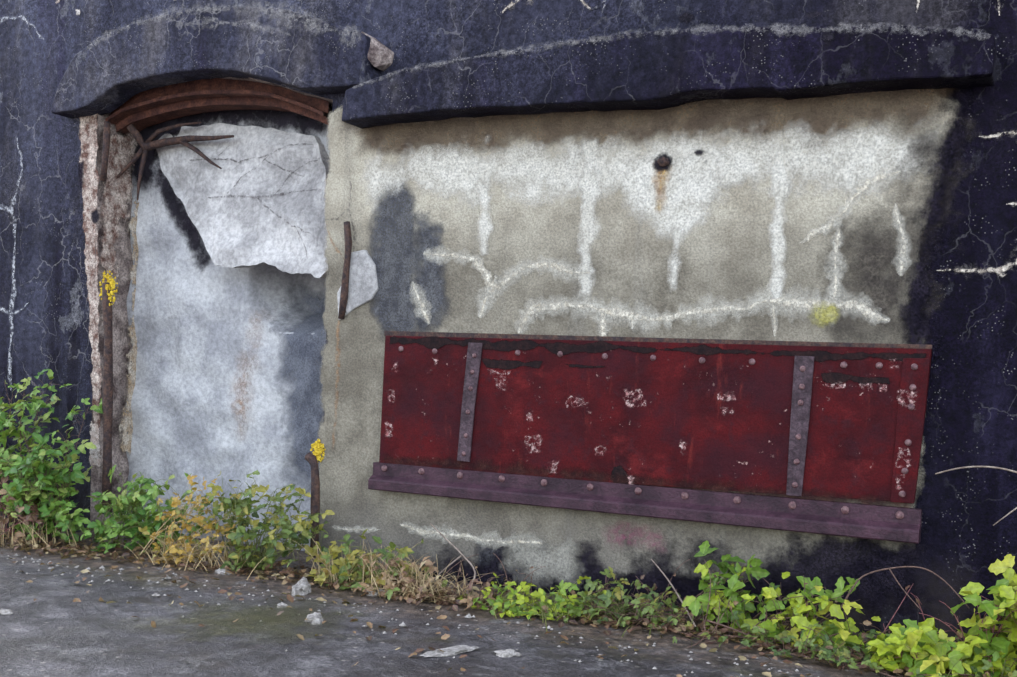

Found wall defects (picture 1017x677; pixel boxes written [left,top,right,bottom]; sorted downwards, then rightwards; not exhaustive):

crack [979,130,1017,138]
leakage [345,88,964,345]
crack [0,138,28,390]
crack [936,259,1017,276]
corrosion [390,336,927,362]
corrosion [385,458,909,507]